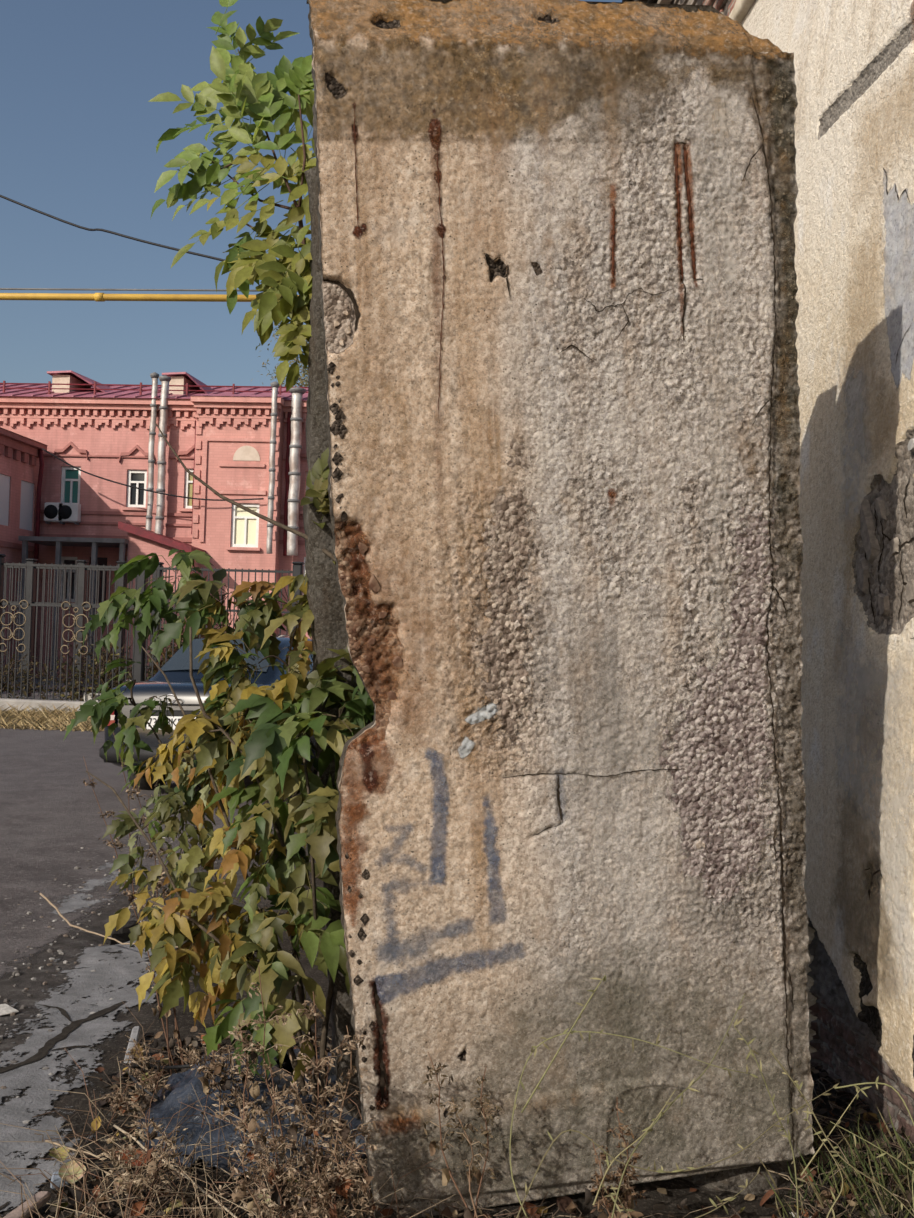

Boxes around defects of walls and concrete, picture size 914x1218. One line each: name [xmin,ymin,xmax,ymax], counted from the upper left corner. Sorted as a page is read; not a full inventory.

spalling [325,73,347,99]
corrosion [352,103,366,239]
corrosion [428,109,446,417]
spalling [484,253,510,296]
corrosion [674,142,703,341]
flaking render [818,0,914,140]
spalling [323,279,403,752]
corrosion [344,522,392,622]
flaking render [852,429,914,635]
corrosion [341,730,389,926]
crack [503,768,685,838]
flaking render [807,918,914,1153]